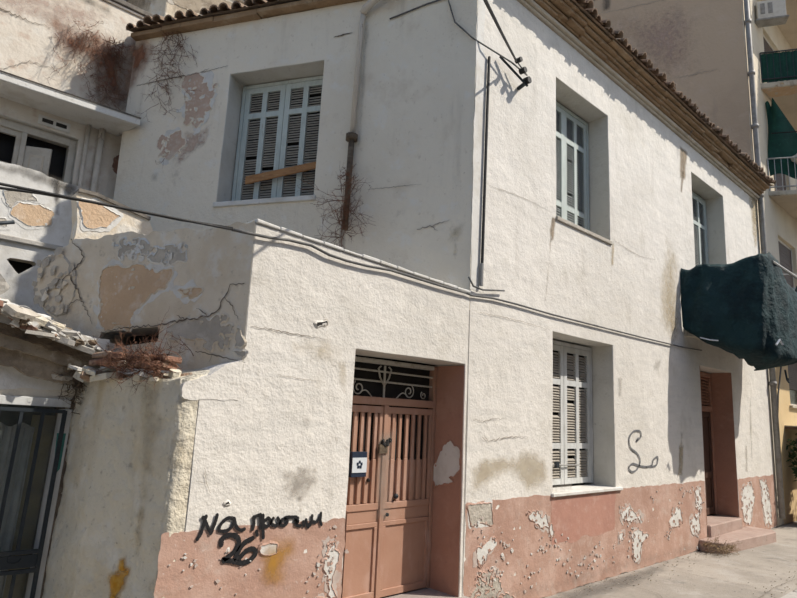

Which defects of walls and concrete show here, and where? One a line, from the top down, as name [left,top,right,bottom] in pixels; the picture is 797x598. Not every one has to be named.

peeling [0,183,61,230]
peeling [76,198,124,232]
peeling [32,247,77,317]
peeling [93,237,249,359]
crack [59,239,327,340]
peeling [302,525,349,598]
peeling [433,439,461,487]
peeling [466,498,540,598]
water stain [477,458,544,484]
peeling [526,503,649,578]
peeling [664,485,705,550]
peeling [741,478,772,528]